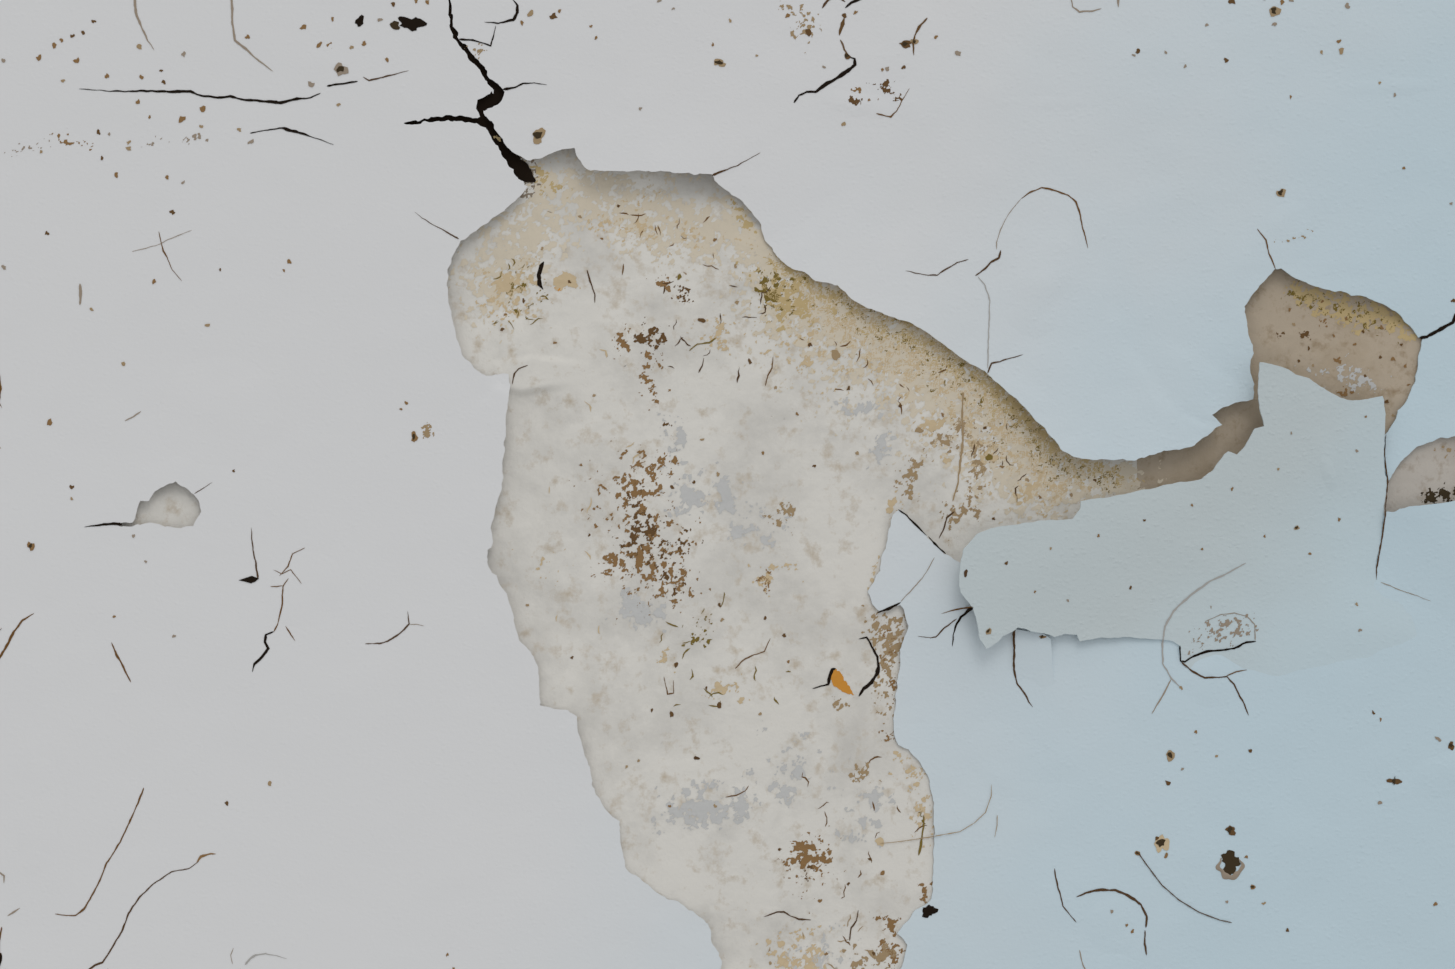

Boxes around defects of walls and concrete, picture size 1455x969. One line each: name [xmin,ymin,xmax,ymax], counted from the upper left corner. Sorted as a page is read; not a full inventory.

crack [85,0,406,145]
crack [404,0,552,213]
crack [794,0,860,103]
crack [587,213,773,386]
crack [1419,314,1455,339]
spalling [118,482,201,538]
crack [251,529,304,672]
crack [660,187,1088,707]
spalling [447,128,1455,969]
crack [0,872,20,965]
crack [57,788,144,916]
crack [89,853,215,969]